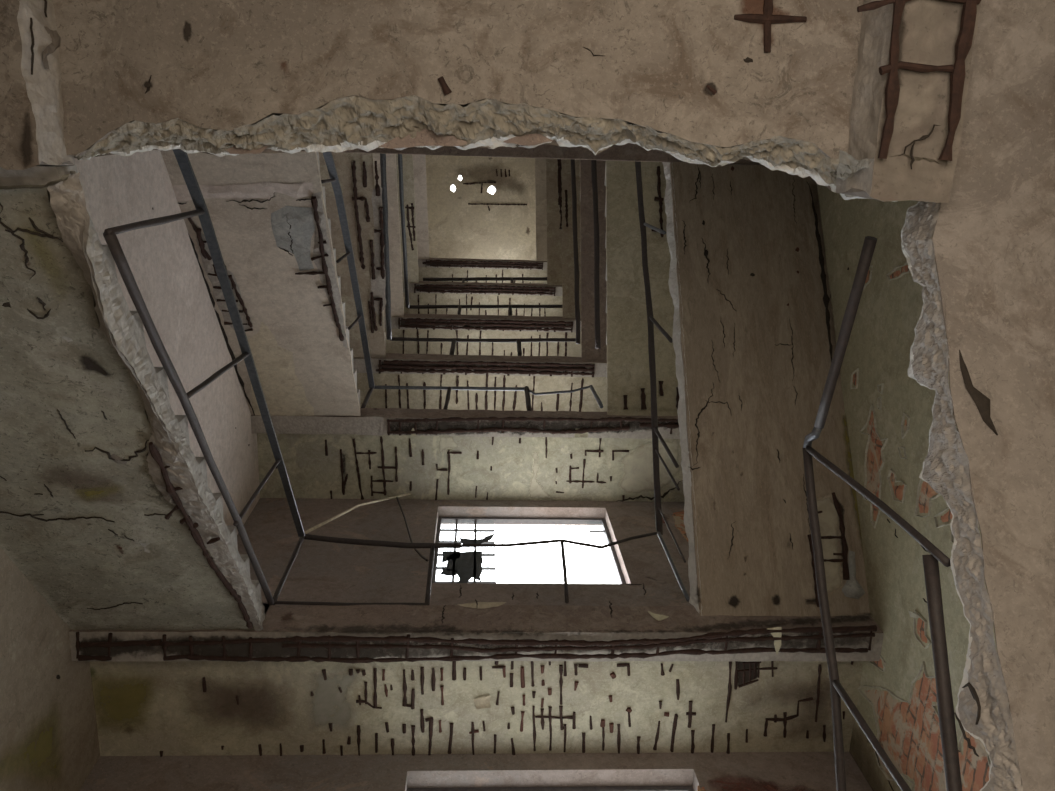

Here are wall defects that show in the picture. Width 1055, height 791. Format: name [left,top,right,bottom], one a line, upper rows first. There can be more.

crack [30,0,47,75]
spalling [43,26,61,70]
crack [0,204,63,279]
spalling [76,0,981,614]
crack [776,319,798,404]
crack [959,350,998,435]
crack [57,409,149,464]
crack [0,484,134,541]
spalling [857,201,1023,791]
spalling [340,725,361,756]